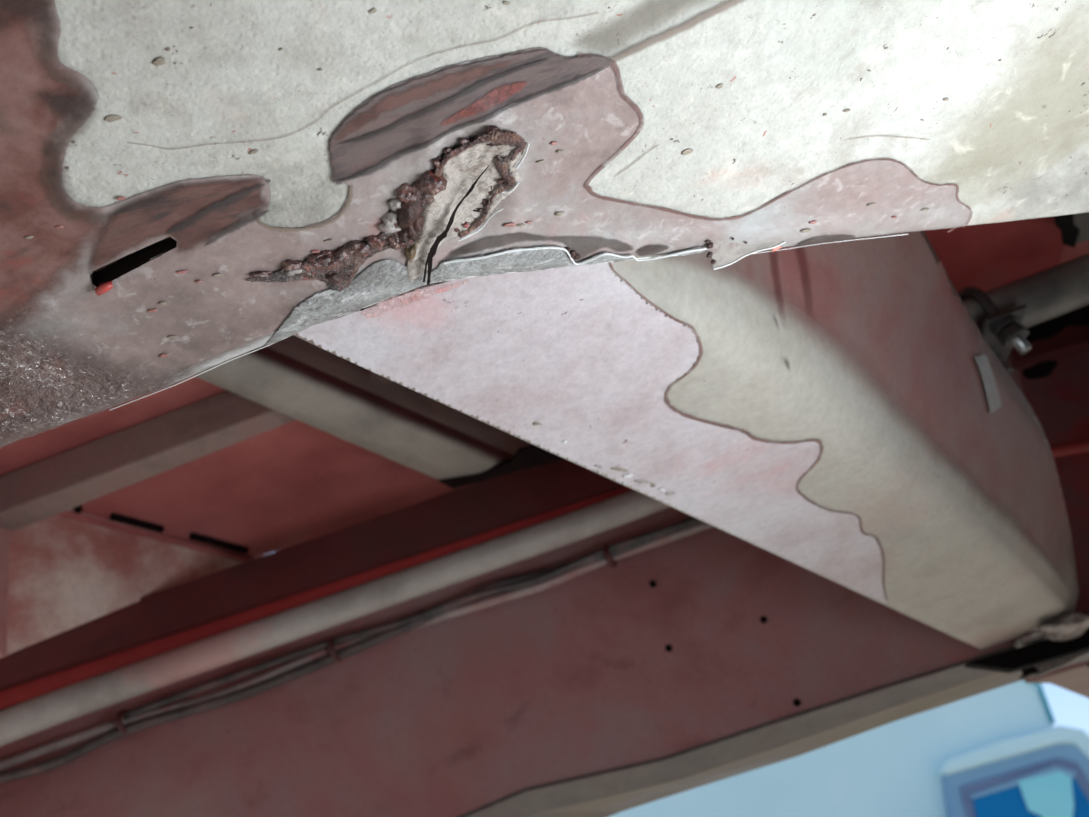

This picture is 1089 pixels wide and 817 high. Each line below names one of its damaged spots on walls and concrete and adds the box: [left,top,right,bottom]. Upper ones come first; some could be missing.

spalling [152,47,171,66]
damp [8,0,972,603]
spalling [109,125,908,411]
spalling [594,465,675,495]